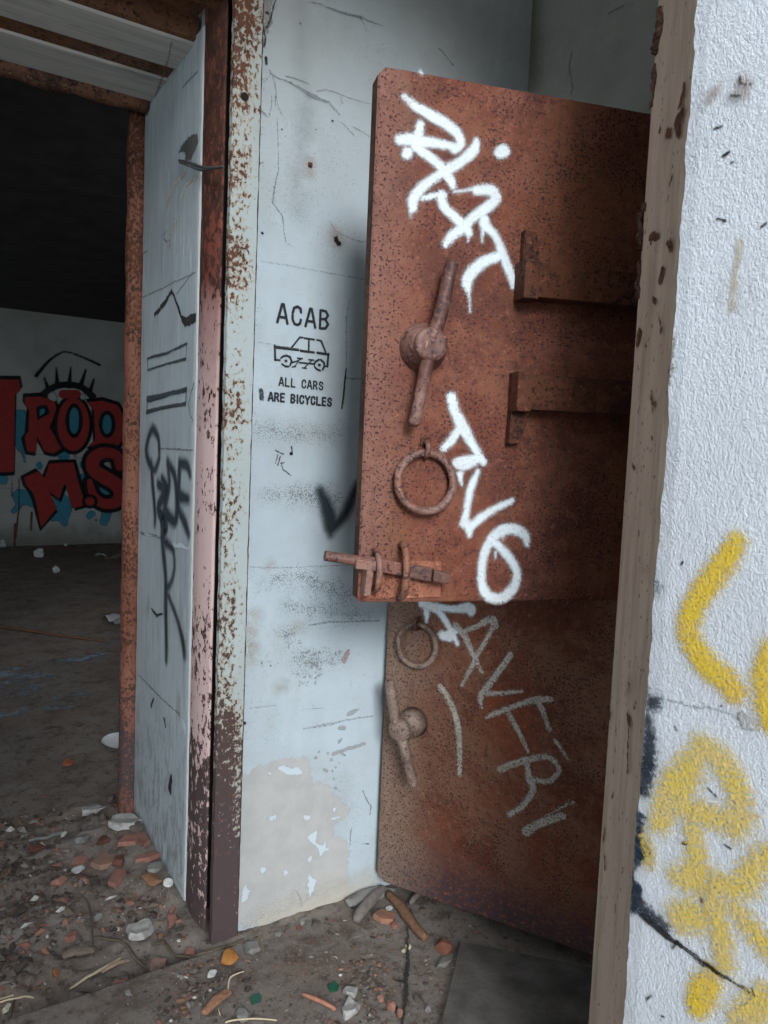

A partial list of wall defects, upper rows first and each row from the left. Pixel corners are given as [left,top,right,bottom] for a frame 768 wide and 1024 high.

crack [311,2,383,26]
crack [269,70,363,279]
corrosion [649,231,673,253]
corrosion [626,702,636,774]
peeling [238,725,370,928]